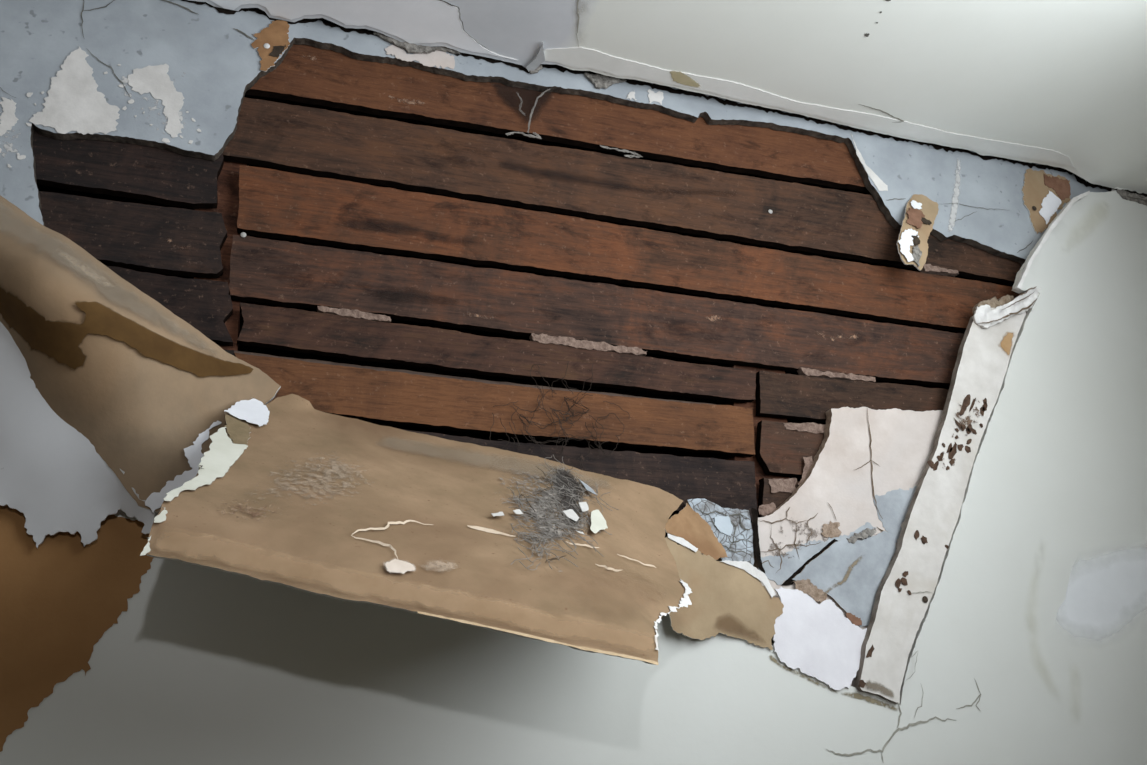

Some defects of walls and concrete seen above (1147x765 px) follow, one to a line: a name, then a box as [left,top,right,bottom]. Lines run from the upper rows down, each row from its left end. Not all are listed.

peeling [0,47,201,168]
crack [81,0,131,98]
crack [162,0,382,40]
peeling [373,32,460,69]
spalling [244,95,888,195]
crack [440,0,1147,201]
spalling [238,301,722,404]
flaking render [145,397,270,523]
peeling [563,478,608,535]
peeling [753,486,928,603]
peeling [927,394,988,471]
crack [827,653,981,763]